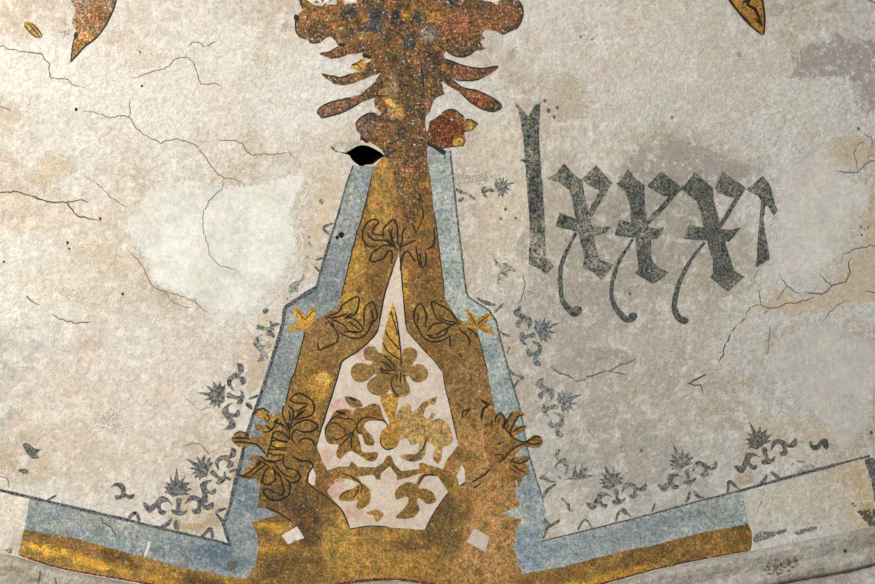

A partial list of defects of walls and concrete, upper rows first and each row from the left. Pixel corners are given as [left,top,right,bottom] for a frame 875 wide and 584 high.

crack [0,45,87,89]
crack [132,41,223,87]
spalling [331,140,396,166]
crack [836,135,875,173]
crack [0,178,126,221]
crack [84,102,295,272]
flaking render [237,167,344,332]
crack [127,250,204,311]
crack [26,296,89,324]
crack [688,244,875,393]